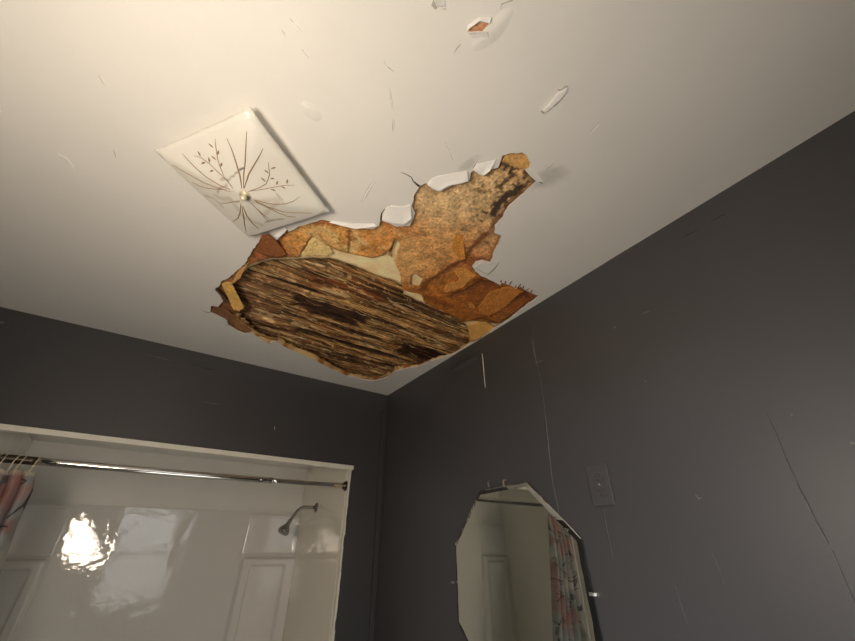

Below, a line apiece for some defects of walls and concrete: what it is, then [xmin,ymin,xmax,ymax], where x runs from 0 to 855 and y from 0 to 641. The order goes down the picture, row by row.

spalling [467,17,492,38]
peeling [502,153,530,169]
peeling [300,237,334,257]
peeling [443,268,476,293]
peeling [468,285,523,316]